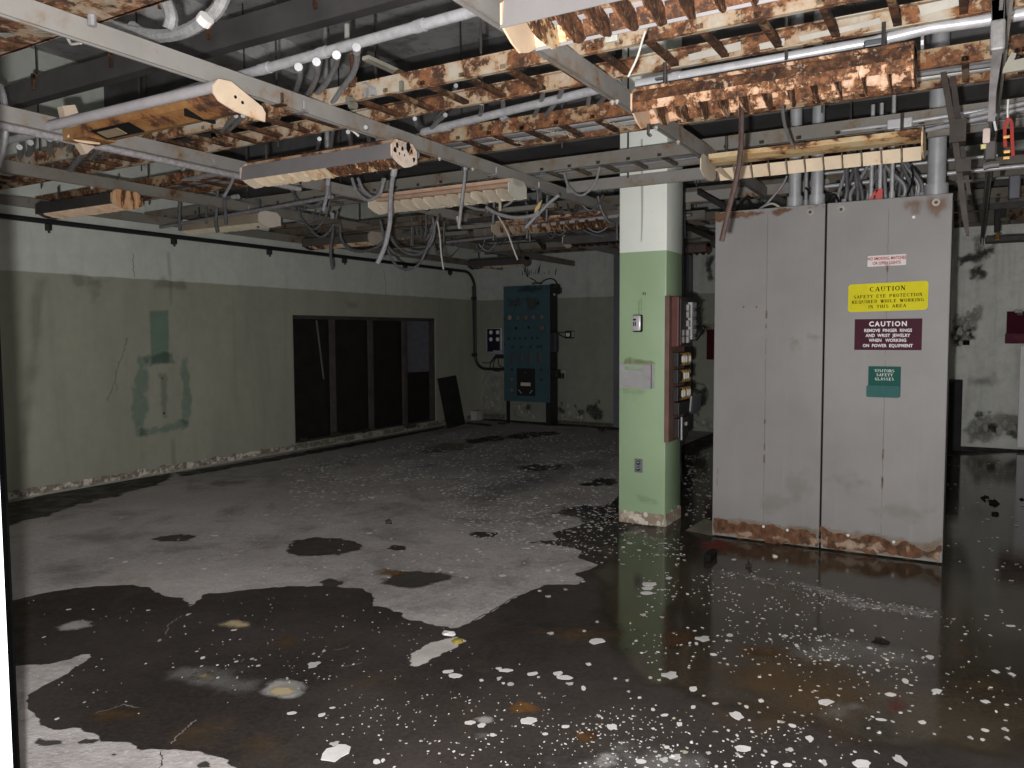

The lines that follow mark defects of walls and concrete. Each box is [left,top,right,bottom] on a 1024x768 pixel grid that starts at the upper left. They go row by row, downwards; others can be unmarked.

leakage [958,243,994,279]
leakage [947,412,1024,456]
leakage [680,433,713,507]
spalling [619,505,681,527]
leakage [13,478,1024,768]